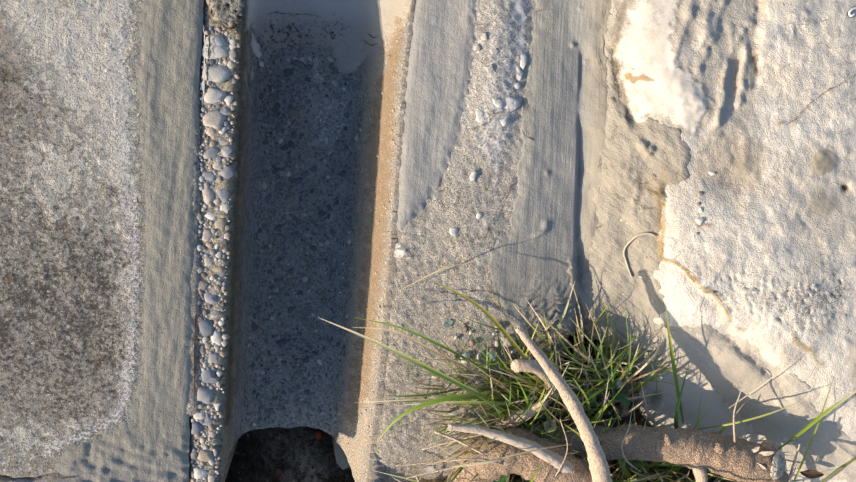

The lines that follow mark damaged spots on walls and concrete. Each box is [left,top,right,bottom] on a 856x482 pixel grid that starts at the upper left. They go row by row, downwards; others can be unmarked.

damp [813,150,836,175]
crack [666,259,731,318]
crack [0,472,77,480]